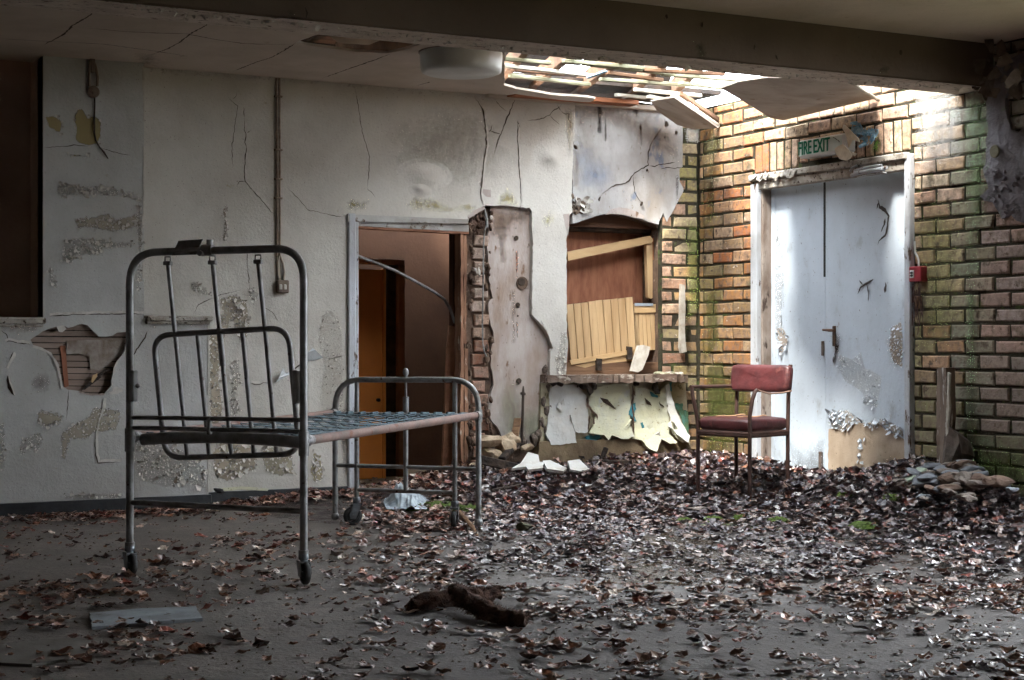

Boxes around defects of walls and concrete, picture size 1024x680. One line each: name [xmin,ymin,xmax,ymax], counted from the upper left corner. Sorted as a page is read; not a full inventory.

peeling [46,109,101,158]
crack [46,13,341,217]
crack [475,95,573,209]
crack [601,127,682,202]
spalling [980,52,1024,223]
peeling [46,181,145,291]
spalling [466,189,568,470]
spalling [31,325,126,459]
peeling [136,442,297,491]
peeling [675,403,689,434]
peeling [825,357,904,476]